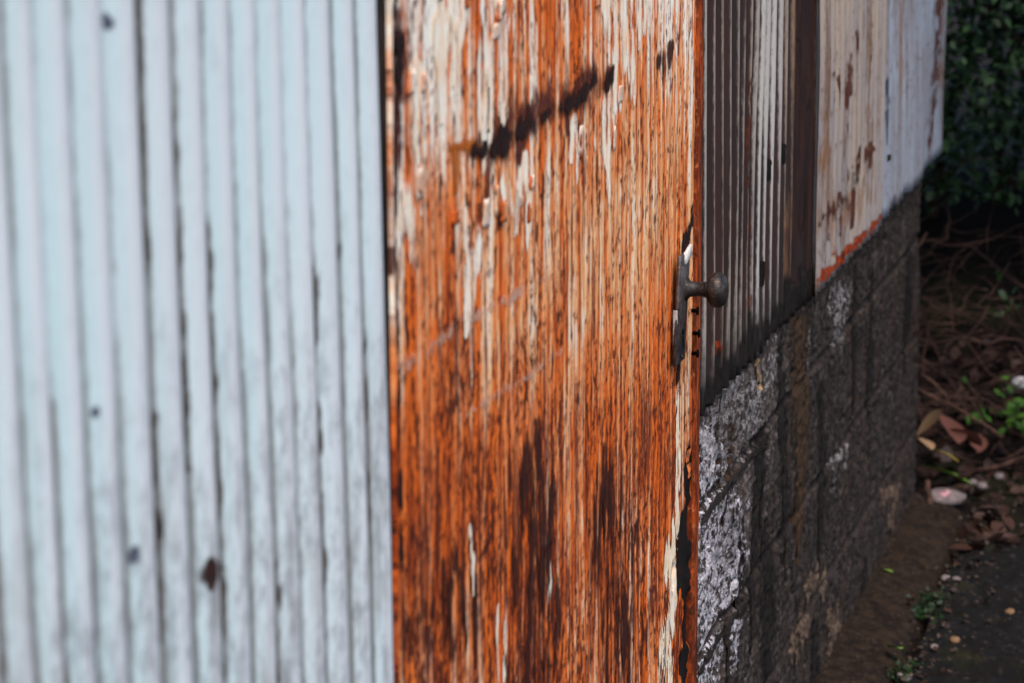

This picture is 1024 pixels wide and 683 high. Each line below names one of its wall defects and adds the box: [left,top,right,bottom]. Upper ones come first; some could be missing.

corrosion [393,0,406,573]
peeling [400,0,510,264]
peeling [452,150,535,339]
corrosion [448,63,615,231]
peeling [568,0,651,205]
corrosion [657,39,674,80]
corrosion [790,0,882,286]
corrosion [200,557,218,591]
corrosion [403,536,493,668]
corrosion [504,418,561,683]
corrosion [589,442,666,683]
peeling [659,390,681,683]